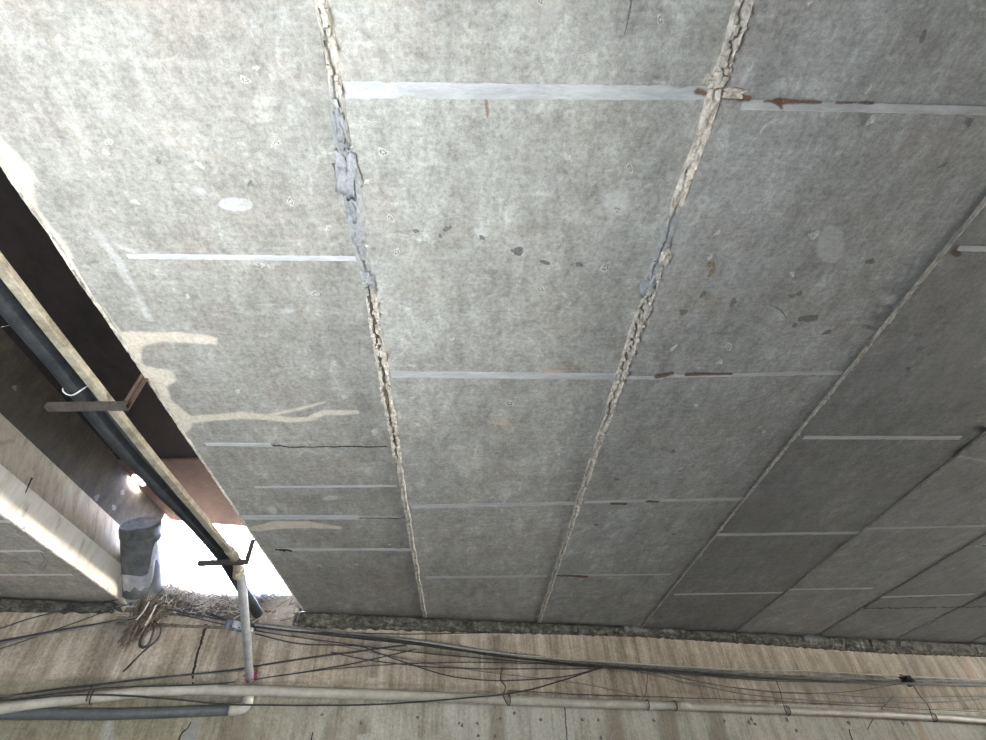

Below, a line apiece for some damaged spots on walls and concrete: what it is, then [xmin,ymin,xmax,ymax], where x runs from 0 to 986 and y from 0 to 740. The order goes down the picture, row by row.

crack [624,0,633,35]
leakage [86,226,362,438]
crack [273,442,387,450]